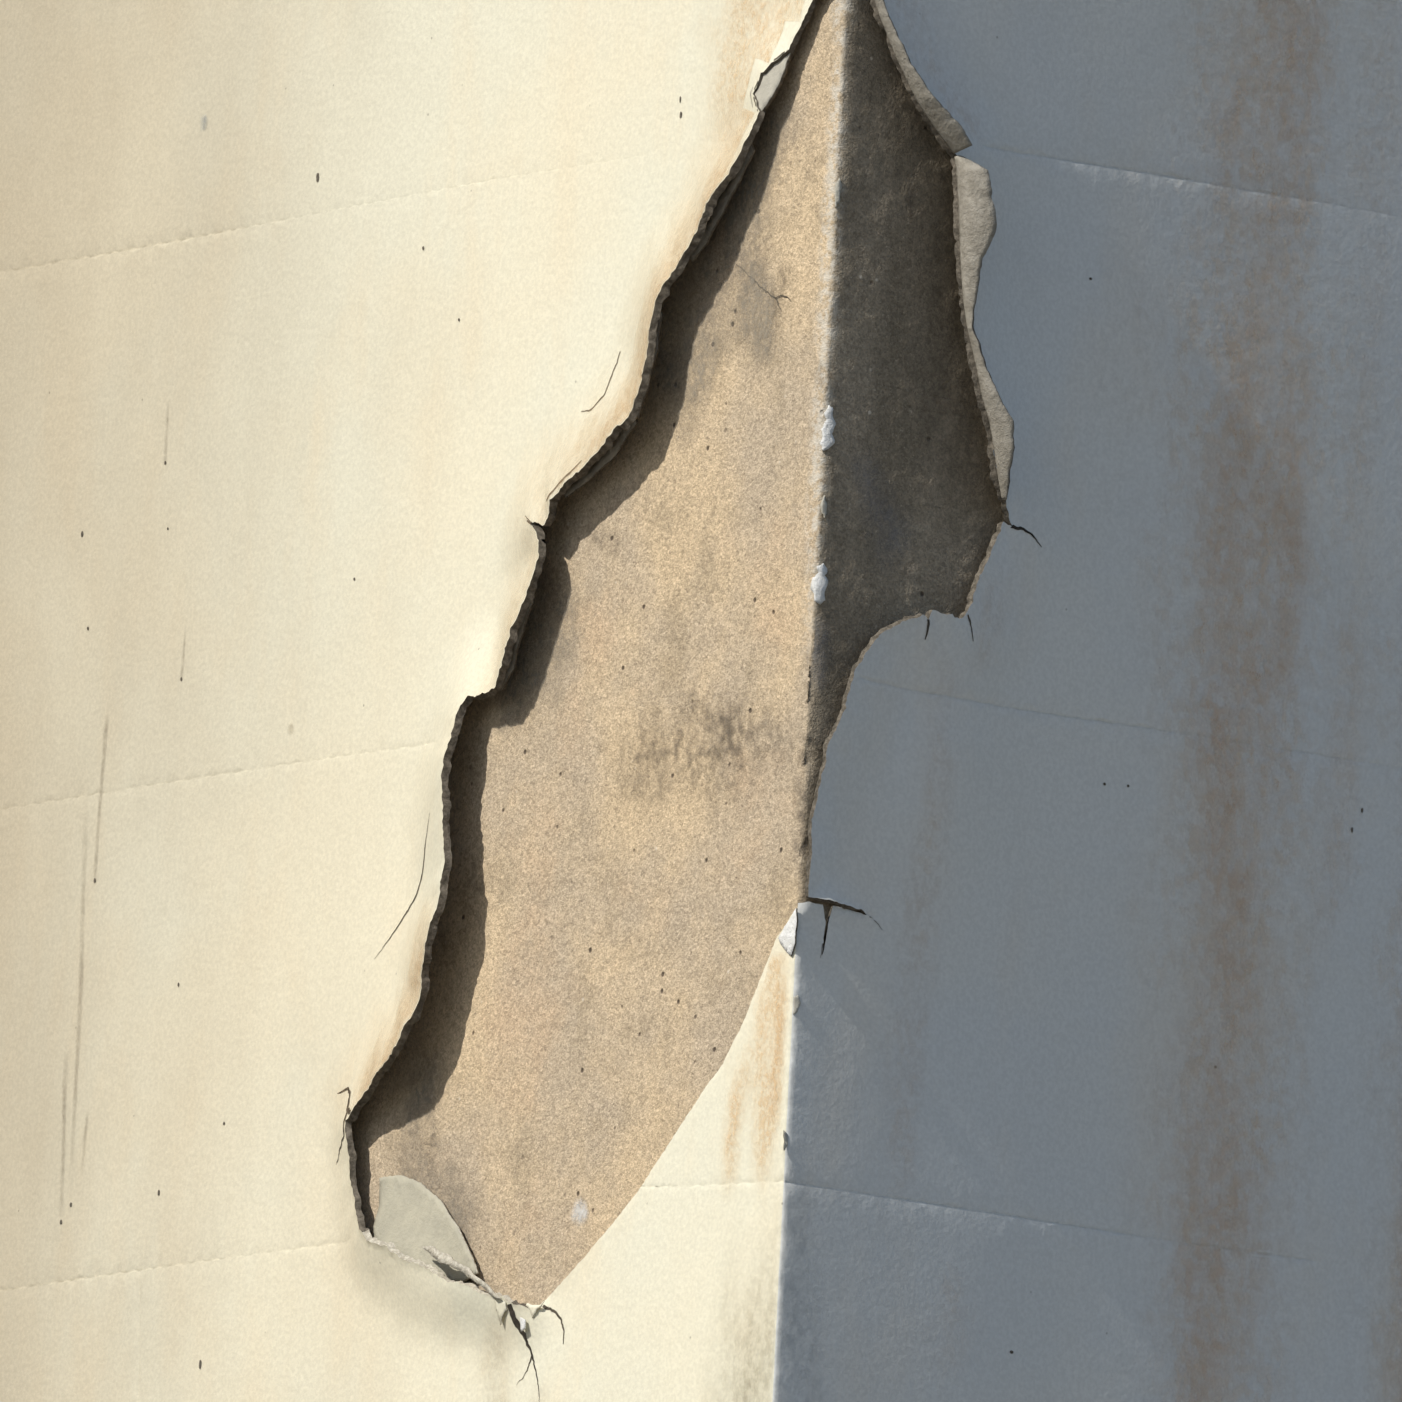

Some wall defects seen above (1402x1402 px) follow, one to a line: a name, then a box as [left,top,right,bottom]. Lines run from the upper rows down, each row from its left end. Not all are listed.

peeling [331,0,1055,1355]